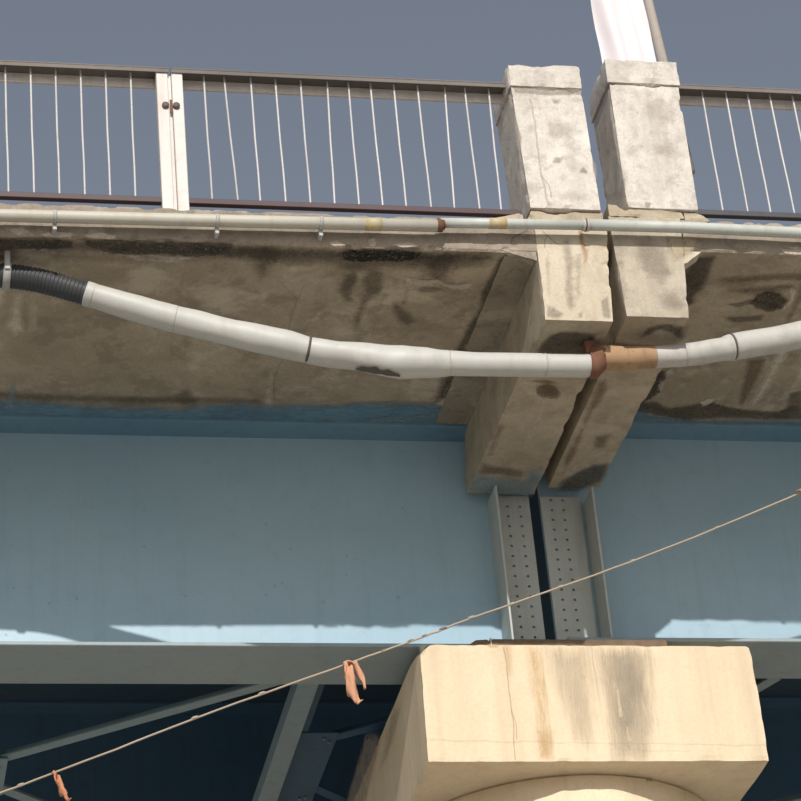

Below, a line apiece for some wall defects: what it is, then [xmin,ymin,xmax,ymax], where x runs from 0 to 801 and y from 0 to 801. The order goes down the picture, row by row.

damp [686,257,713,304]
damp [638,352,801,422]
damp [560,466,605,491]